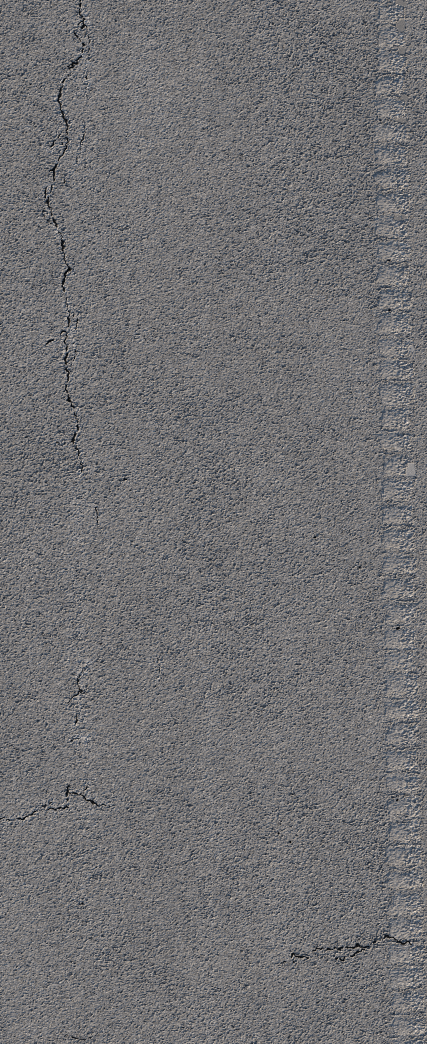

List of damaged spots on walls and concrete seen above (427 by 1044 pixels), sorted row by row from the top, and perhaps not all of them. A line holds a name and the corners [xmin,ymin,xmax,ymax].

crack [42,0,90,472]
crack [0,785,110,821]
crack [283,935,411,963]